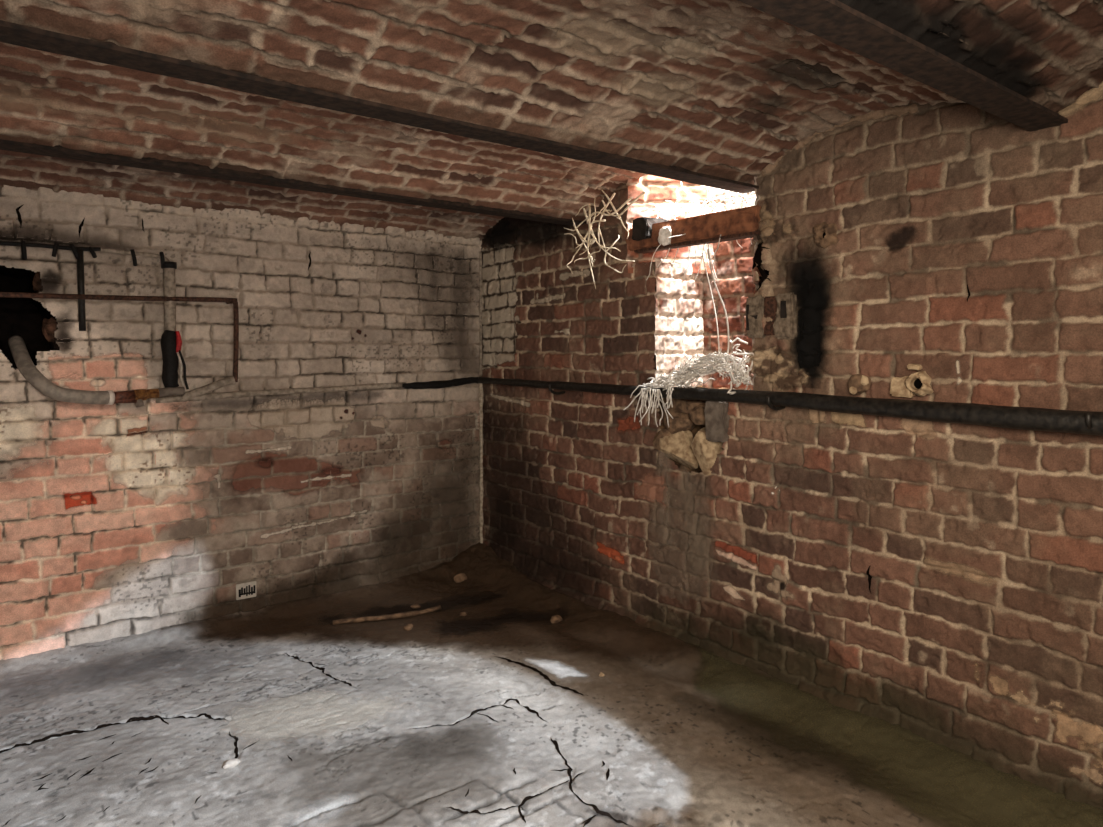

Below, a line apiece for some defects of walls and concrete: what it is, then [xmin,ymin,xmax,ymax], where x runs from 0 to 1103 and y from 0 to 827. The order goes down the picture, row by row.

leakage [785,251,826,388]
peeling [0,265,219,660]
peeling [231,451,362,496]
peeling [248,398,355,440]
crack [0,713,239,759]
crack [410,699,628,825]
crack [495,656,588,696]
peeling [975,663,1103,784]